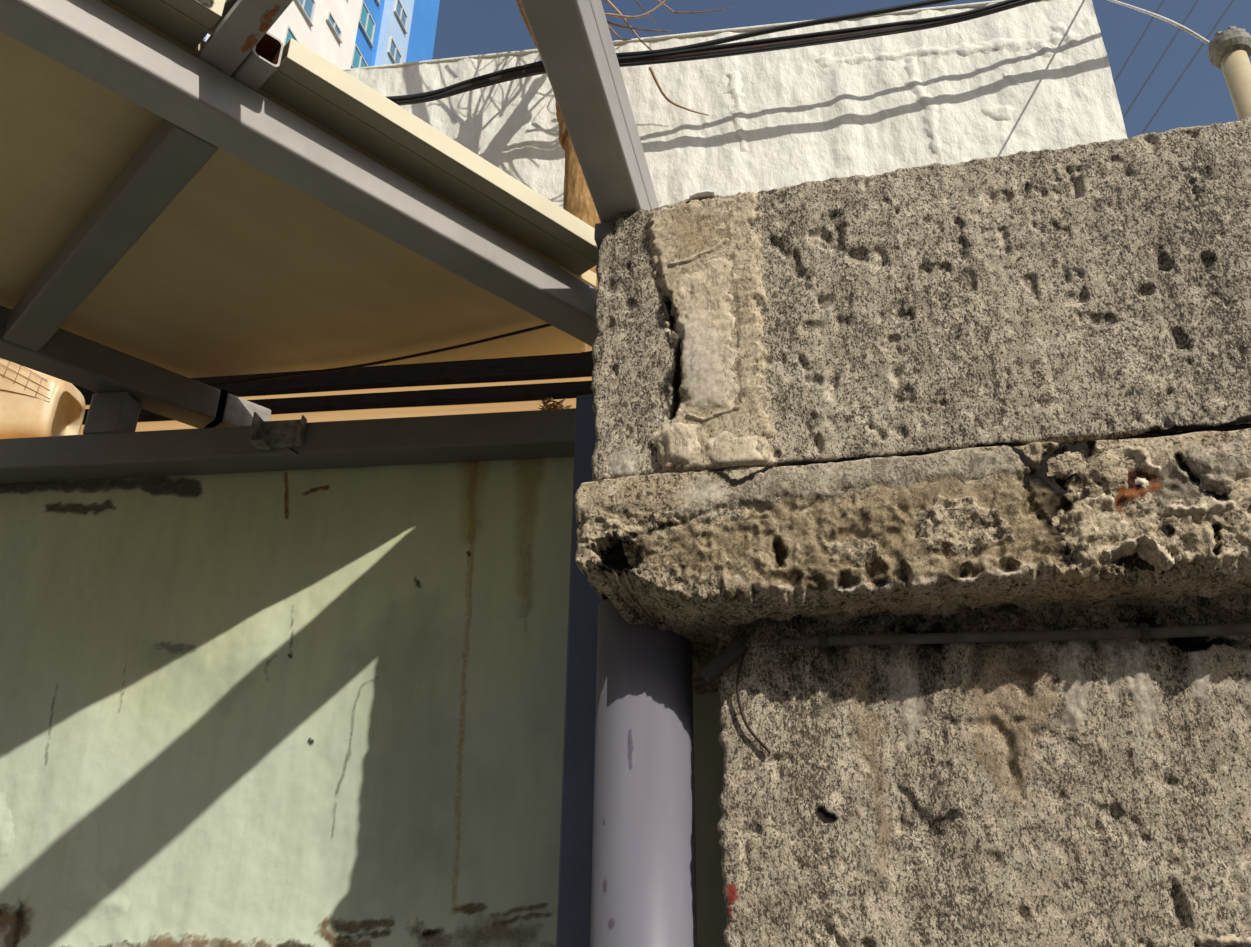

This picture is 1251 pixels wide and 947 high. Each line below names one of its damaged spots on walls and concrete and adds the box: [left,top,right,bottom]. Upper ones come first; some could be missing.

crack [660,297,686,420]
crack [975,440,1028,448]
crack [1129,415,1251,439]
crack [709,451,941,485]
corrosion [1115,470,1162,514]
spalling [596,433,1251,594]
peeling [0,904,29,947]
peeling [127,935,310,947]
peeling [320,916,394,947]